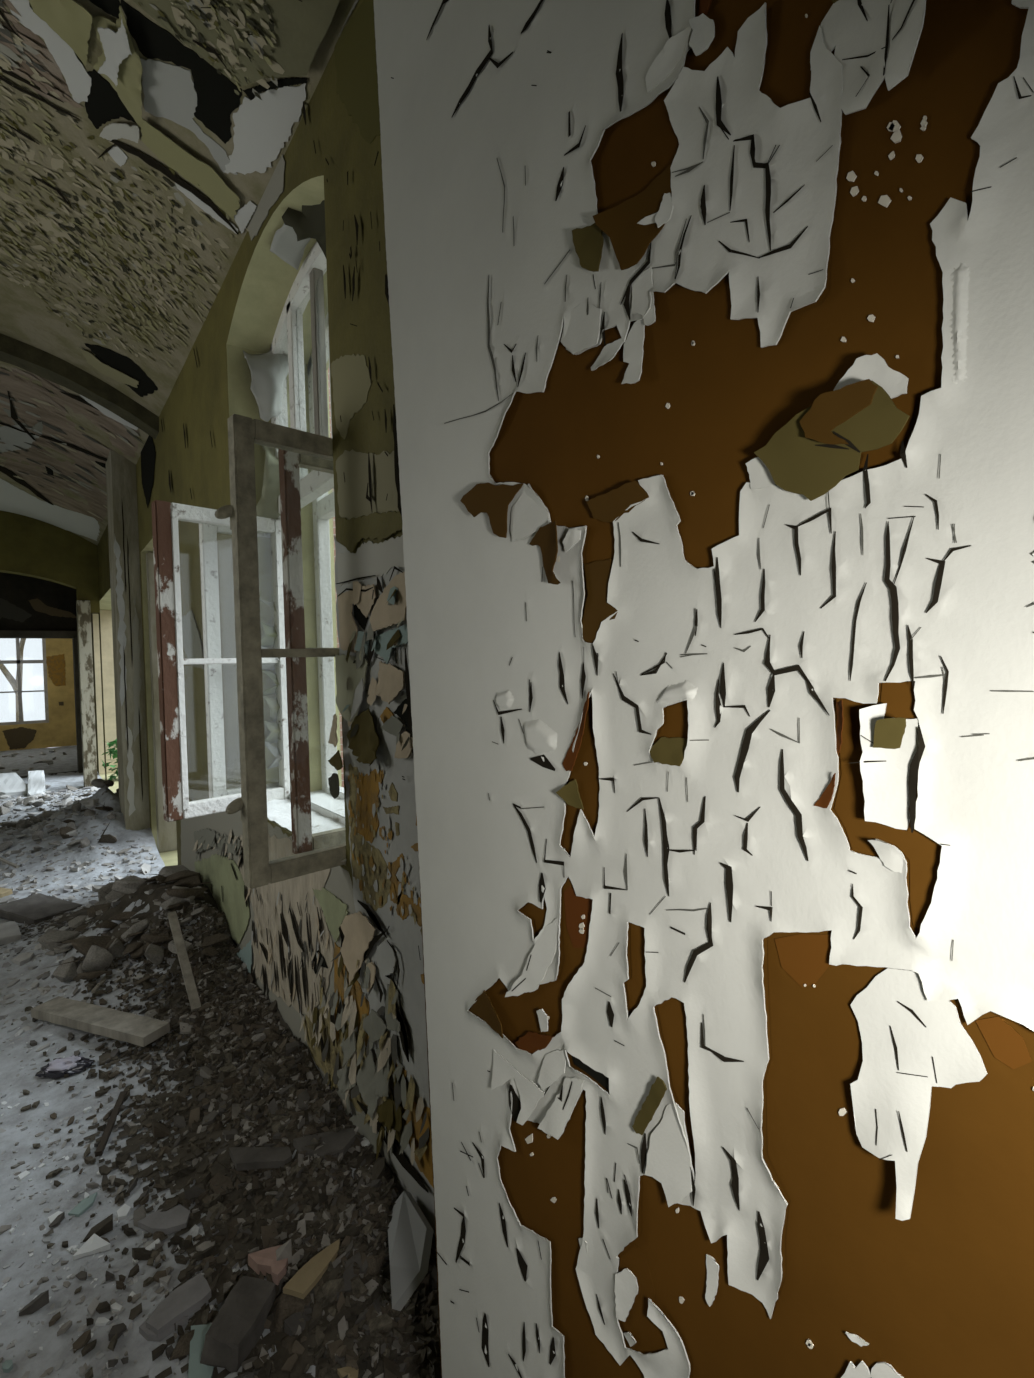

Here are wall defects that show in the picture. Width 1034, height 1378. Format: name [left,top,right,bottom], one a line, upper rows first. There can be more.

crack [426,0,449,40]
crack [452,0,552,117]
peeling [561,161,672,384]
peeling [746,353,910,501]
crack [488,431,990,982]
crack [991,687,1034,695]
peeling [836,700,919,873]
spalling [181,511,436,1236]
crack [595,988,624,1046]
peeling [632,1077,692,1213]
crack [701,1014,744,1062]
peeling [838,968,987,1221]